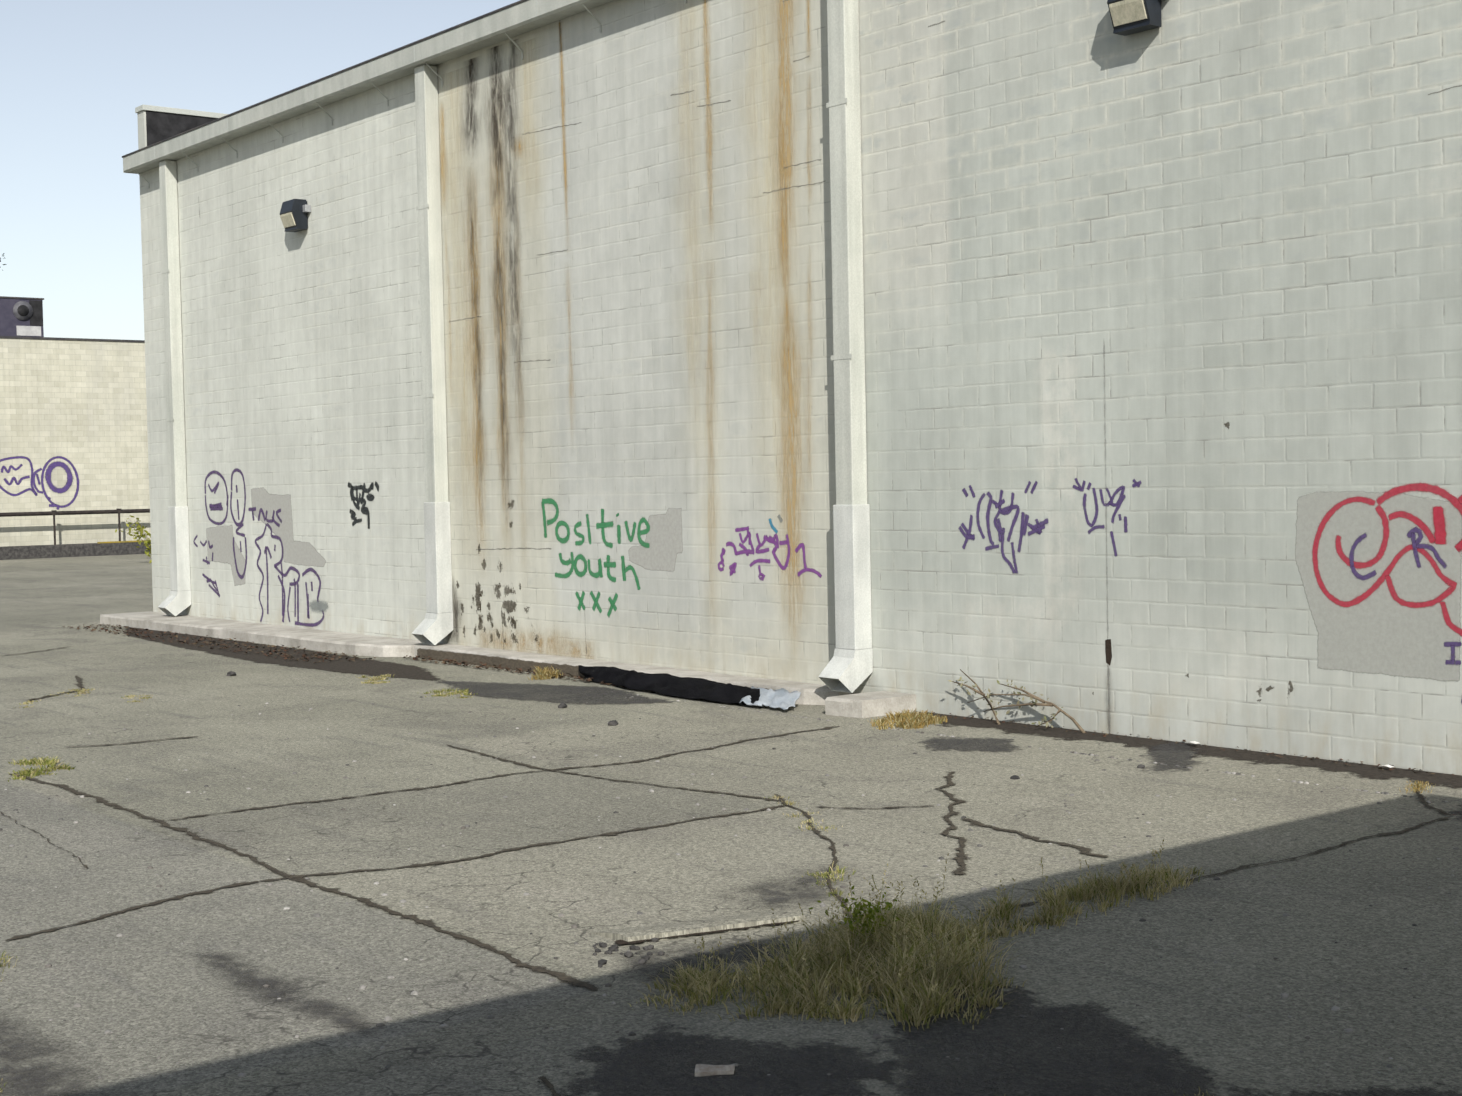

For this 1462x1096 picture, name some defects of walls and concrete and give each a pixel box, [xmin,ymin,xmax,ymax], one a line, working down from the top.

rust [779,0,792,264]
rust [470,225,482,465]
rust [495,156,505,446]
rust [782,344,798,580]